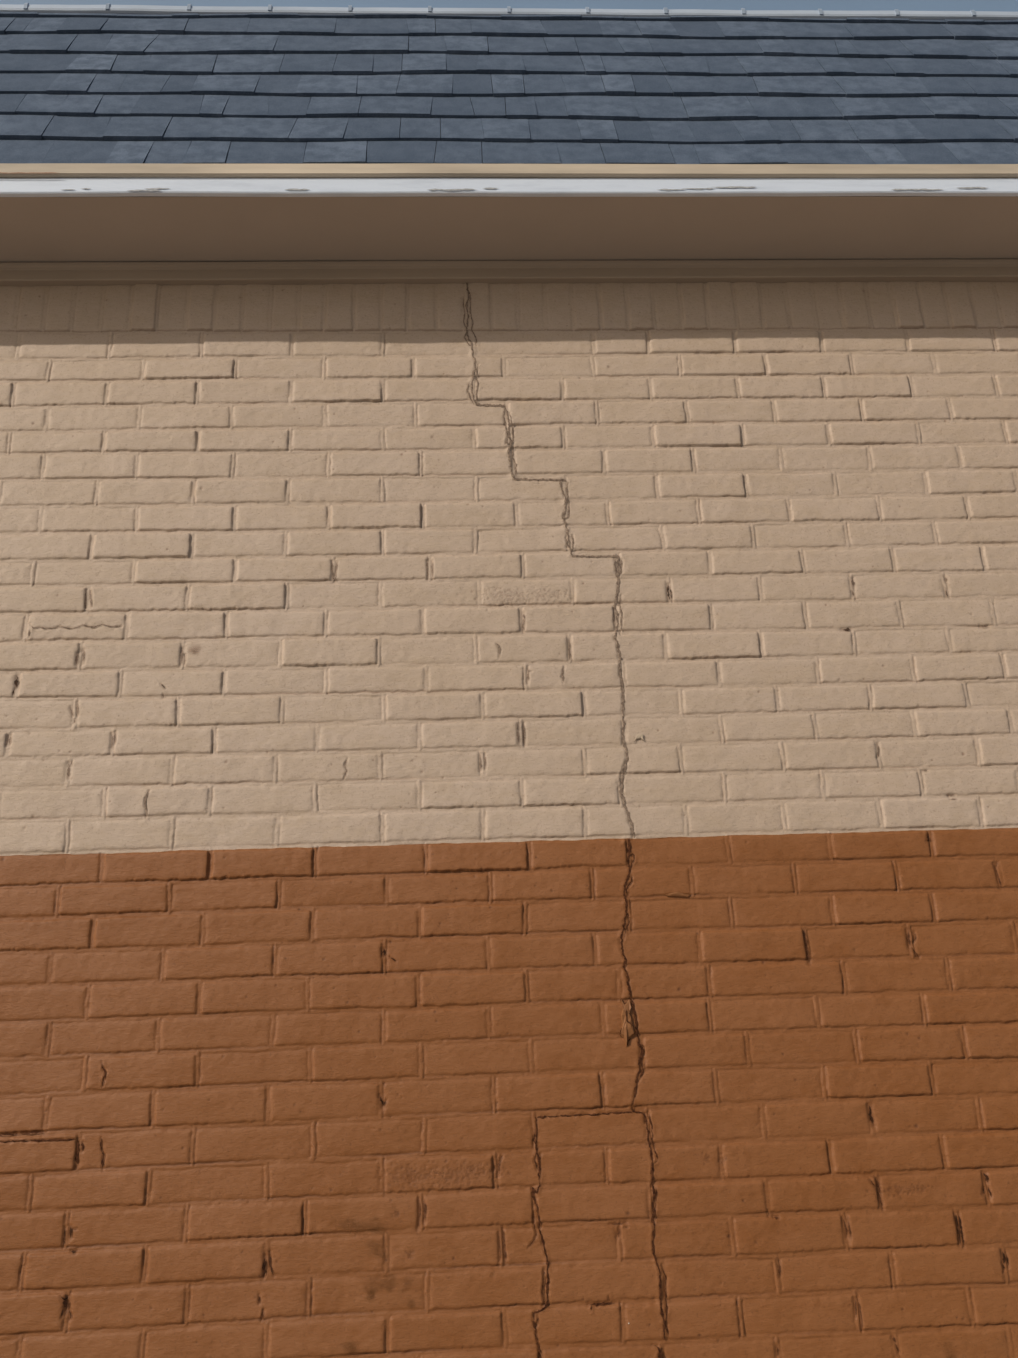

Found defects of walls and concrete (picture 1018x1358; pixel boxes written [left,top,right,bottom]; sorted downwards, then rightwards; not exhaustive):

crack [28,624,120,636]
crack [463,283,669,1358]
crack [0,1131,104,1168]